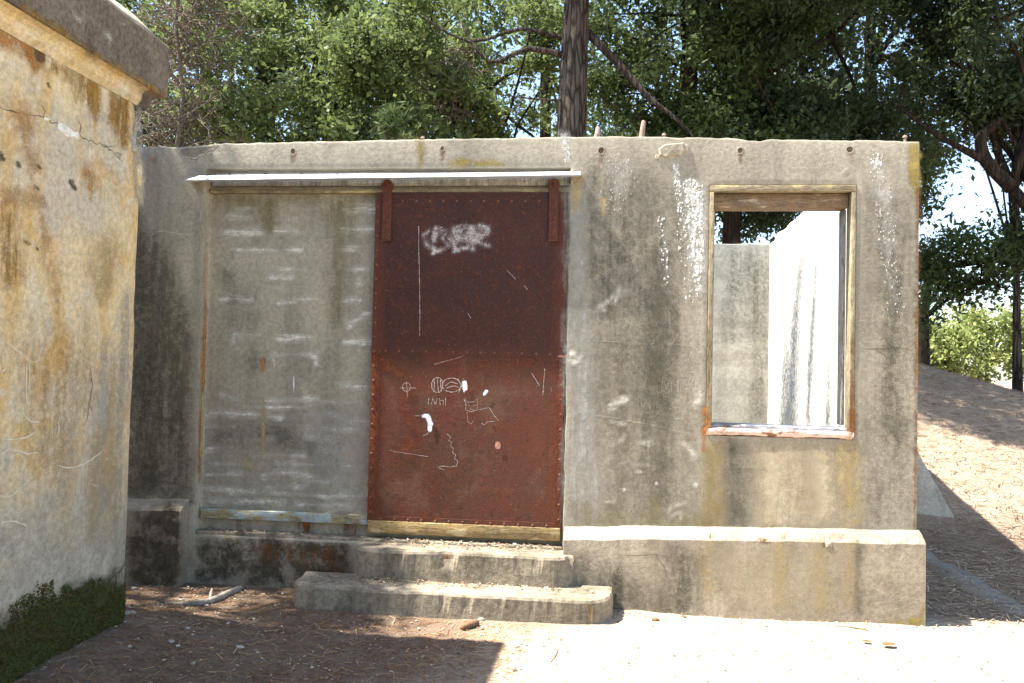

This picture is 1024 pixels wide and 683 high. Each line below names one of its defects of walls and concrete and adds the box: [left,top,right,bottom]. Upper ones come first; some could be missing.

crack [1,105,130,170]
damp [51,63,128,145]
damp [4,215,17,284]
damp [91,218,193,585]
corrosion [199,254,207,477]
corrosion [368,355,416,516]
damp [598,153,707,524]
corrosion [702,407,711,452]
damp [868,150,905,446]